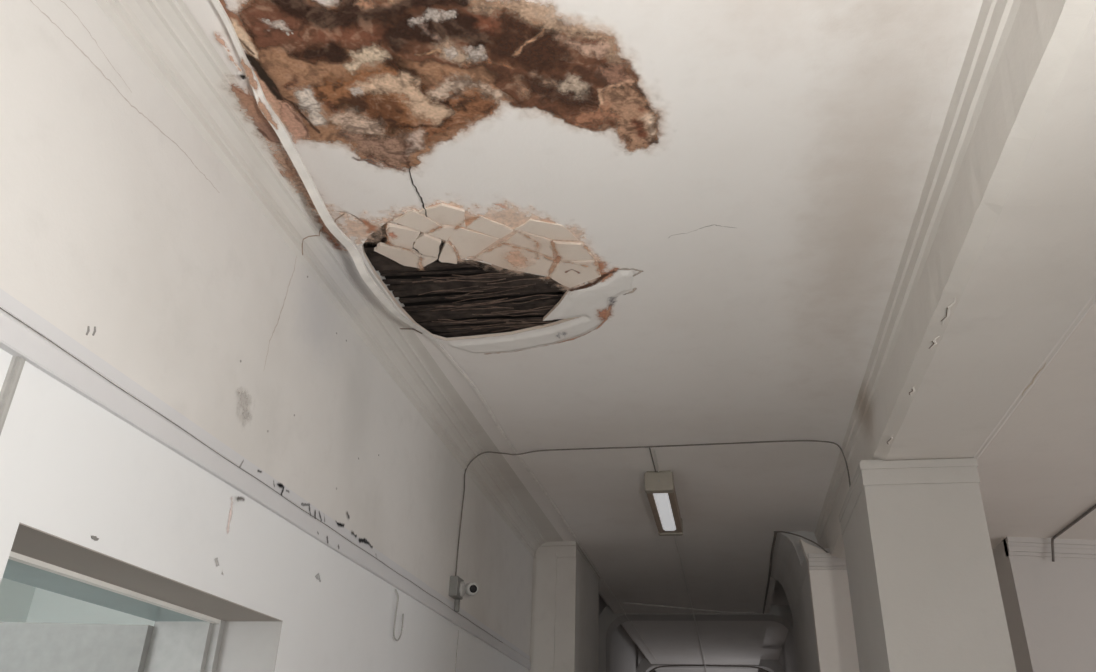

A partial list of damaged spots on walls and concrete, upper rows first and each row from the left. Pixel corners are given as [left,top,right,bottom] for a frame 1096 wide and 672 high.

crack [30,0,217,190]
flaking render [219,0,320,143]
flaking render [362,203,601,341]